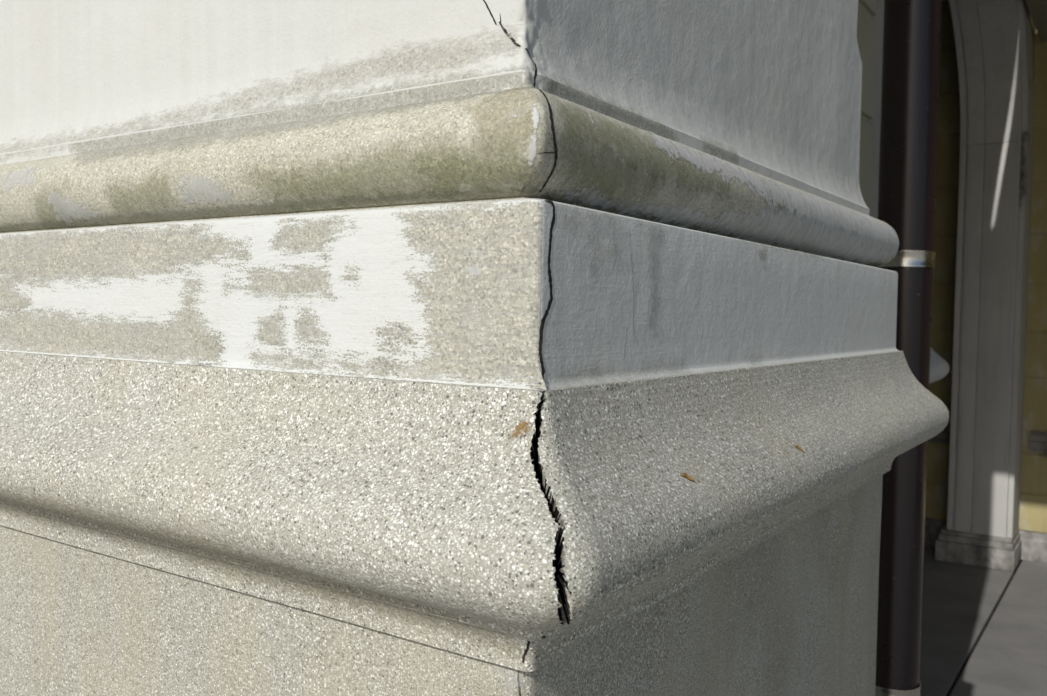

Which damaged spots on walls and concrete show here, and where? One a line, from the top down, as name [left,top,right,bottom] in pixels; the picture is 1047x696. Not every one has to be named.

water stain [77,68,527,163]
water stain [547,77,729,190]
water stain [704,140,738,163]
peeling [0,199,547,394]
crack [483,0,573,625]
crack [517,641,530,696]